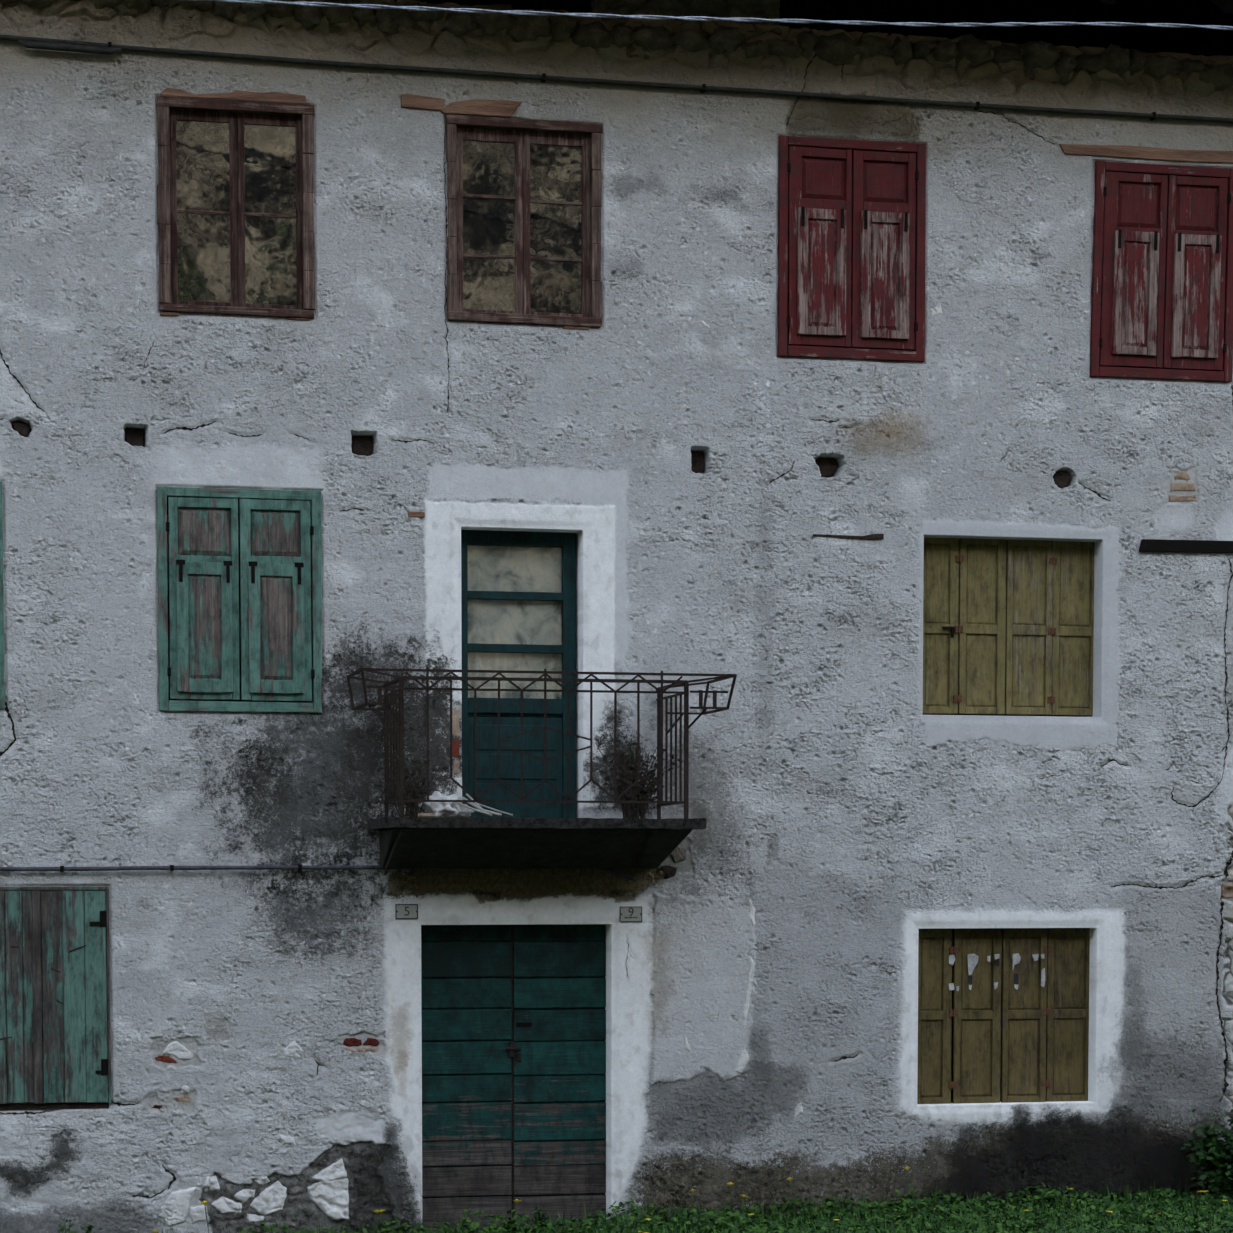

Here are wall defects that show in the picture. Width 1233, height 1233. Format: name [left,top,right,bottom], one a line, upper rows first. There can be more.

crack [0,349,45,412]
crack [0,701,16,756]
crack [1166,559,1233,814]
damp [192,616,666,964]
spalling [1221,880,1233,903]
peeling [742,957,756,1029]
peeling [735,1047,749,1074]
damp [0,1128,165,1233]
peeling [160,1141,395,1233]
damp [629,1063,1225,1228]